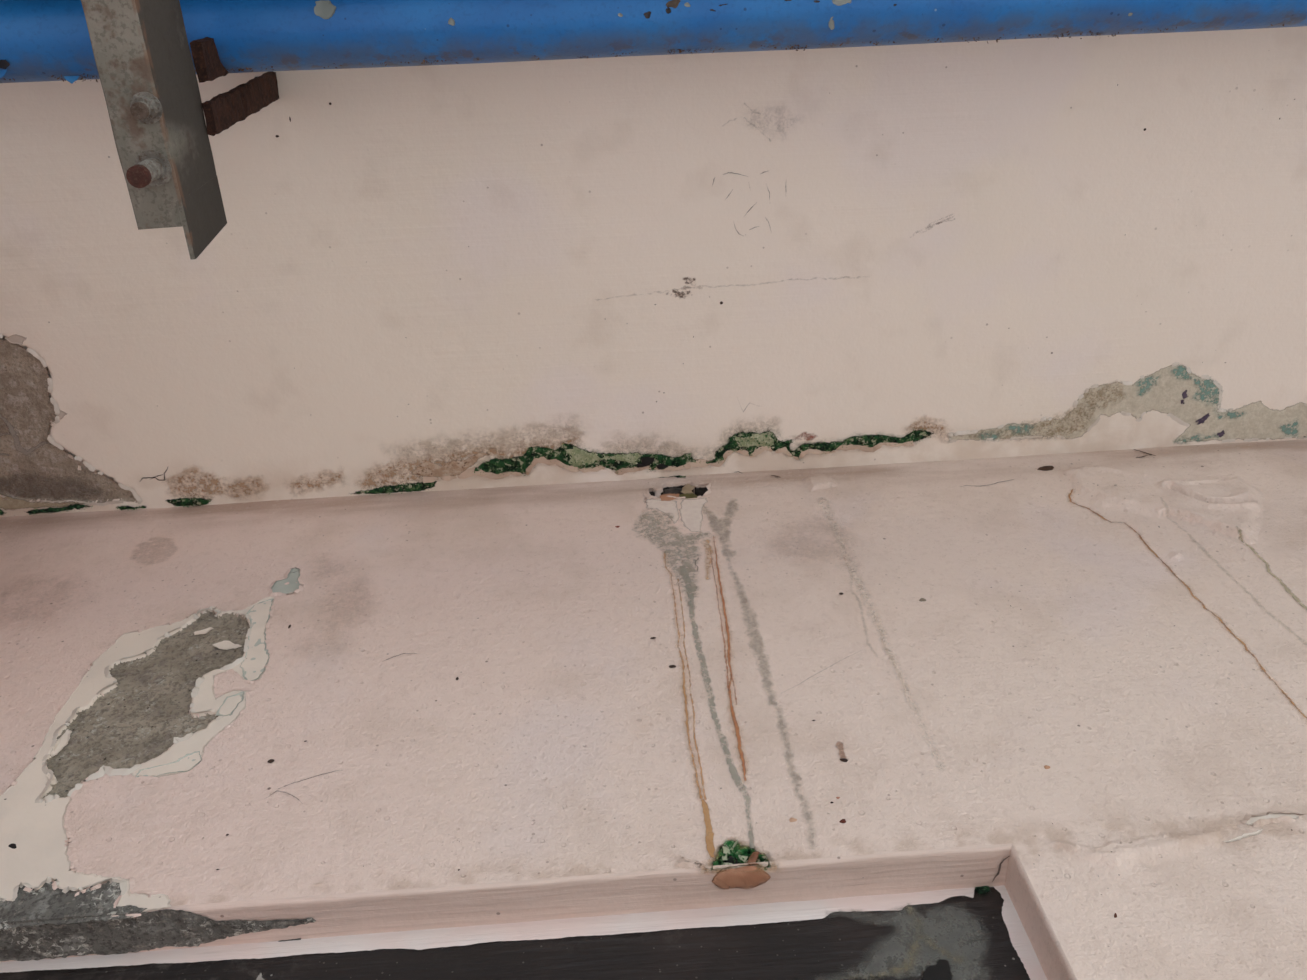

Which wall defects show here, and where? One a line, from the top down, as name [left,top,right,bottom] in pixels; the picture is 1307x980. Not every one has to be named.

peeling [0,334,143,510]
damp [362,449,526,487]
spalling [645,483,712,532]
peeling [946,362,1307,444]
peeling [0,567,316,961]
rust [664,553,715,858]
damp [636,511,755,848]
rust [706,540,746,781]